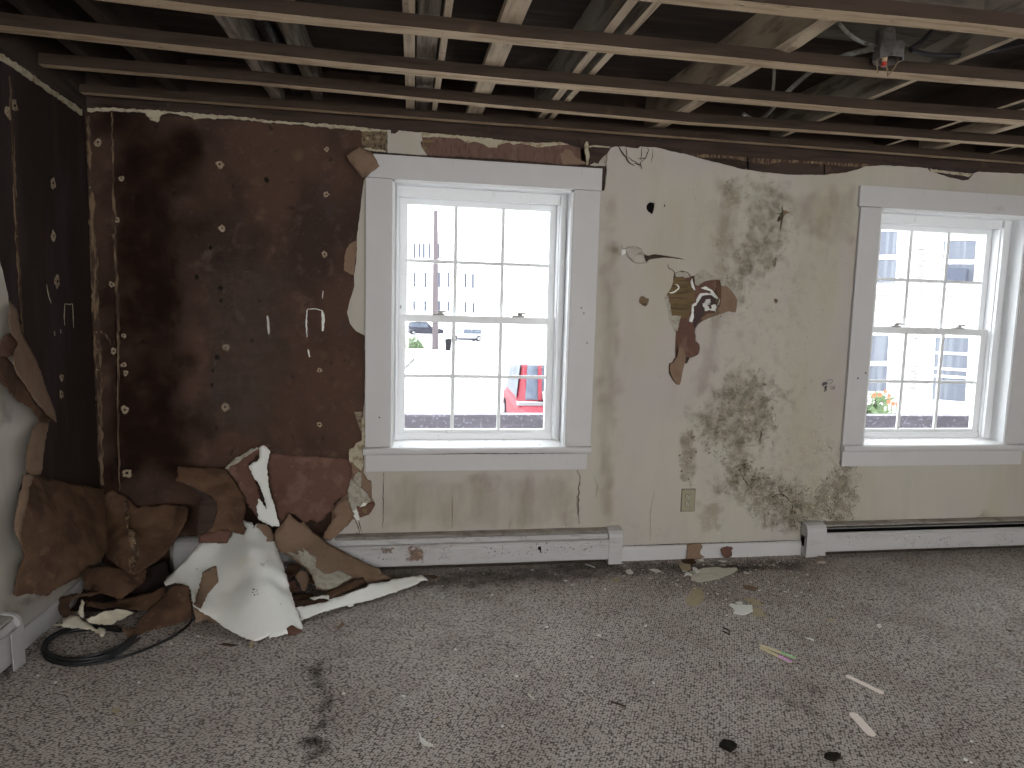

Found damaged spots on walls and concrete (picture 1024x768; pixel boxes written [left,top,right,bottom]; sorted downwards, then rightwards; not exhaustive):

peeling [420,132,610,191]
crack [618,146,653,169]
water stain [104,111,201,485]
peeling [0,61,394,648]
spalling [664,266,737,385]
water stain [690,359,858,531]
corrosion [408,547,426,561]